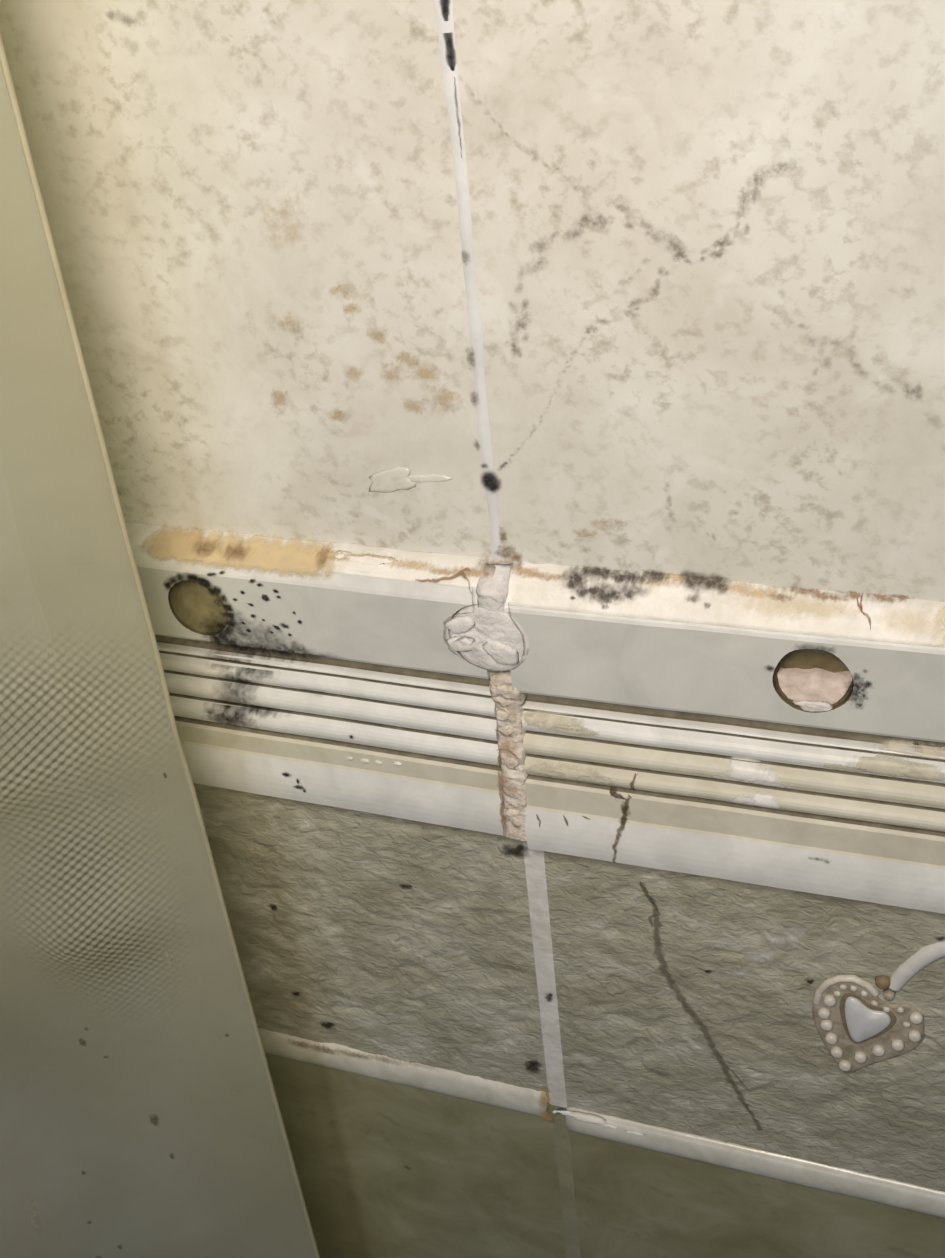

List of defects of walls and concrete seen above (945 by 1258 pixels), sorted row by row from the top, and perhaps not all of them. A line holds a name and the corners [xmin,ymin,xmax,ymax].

leakage [149,527,343,725]
leakage [569,567,770,608]
crack [609,768,646,863]
crack [639,882,762,1130]